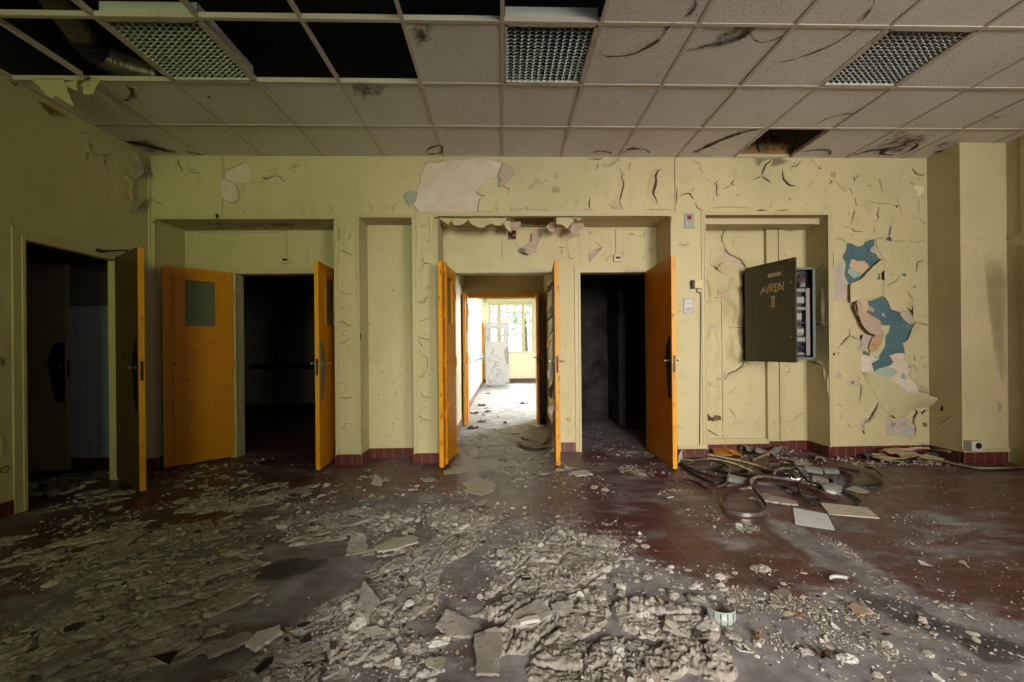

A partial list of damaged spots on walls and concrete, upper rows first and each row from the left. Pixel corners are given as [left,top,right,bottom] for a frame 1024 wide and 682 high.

peeling [758,129,783,151]
damp [855,132,927,156]
peeling [404,157,515,235]
crack [558,131,928,288]
peeling [832,238,938,438]